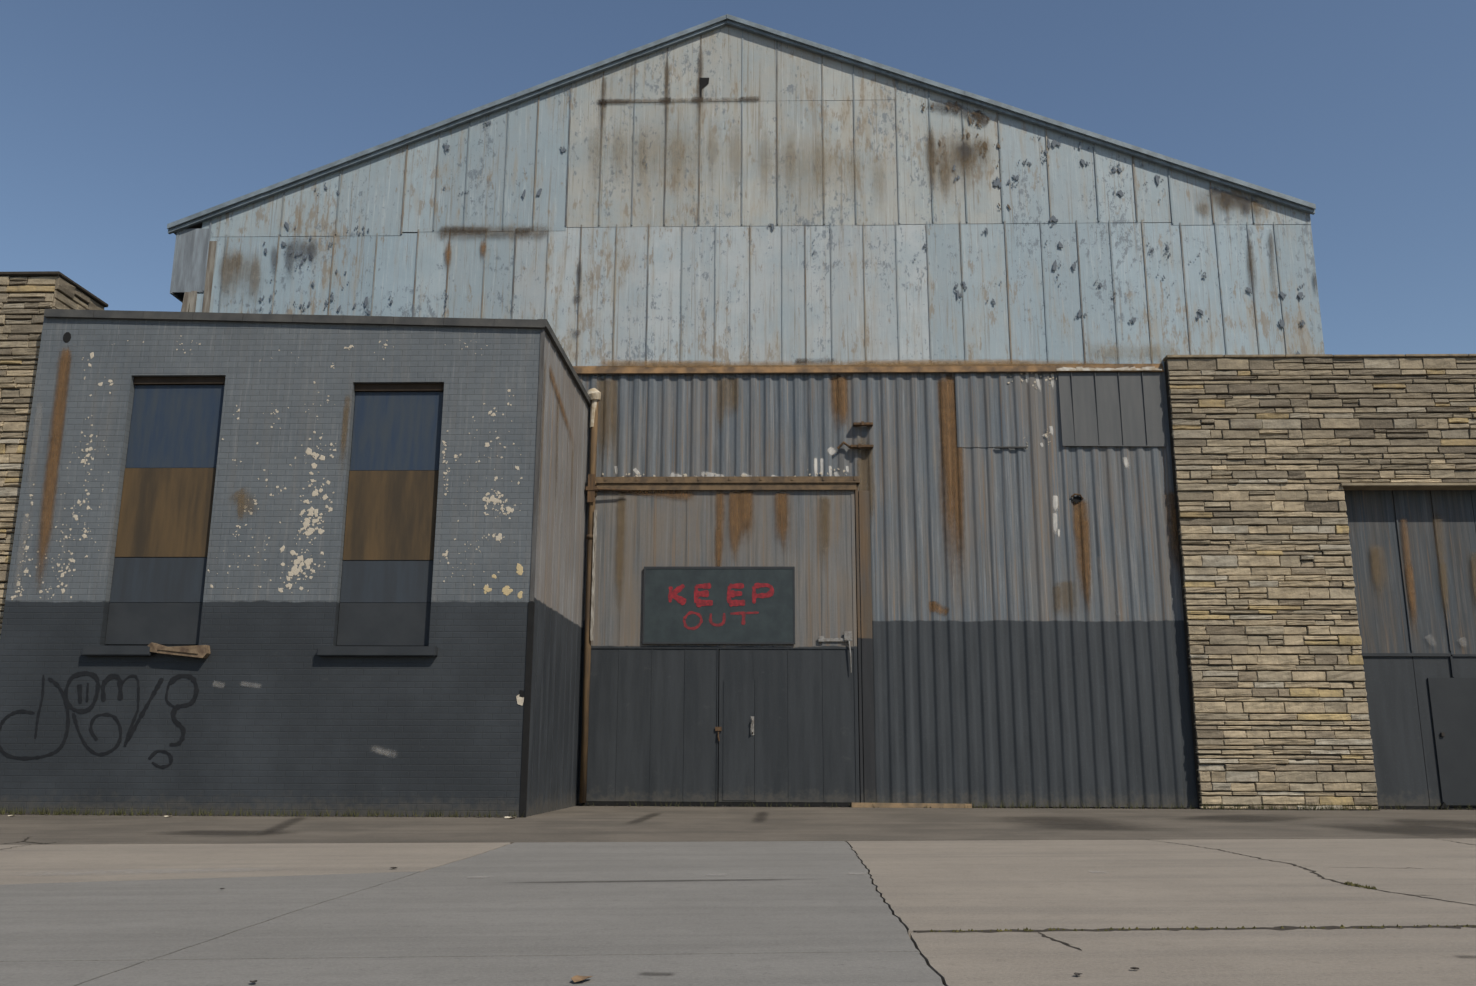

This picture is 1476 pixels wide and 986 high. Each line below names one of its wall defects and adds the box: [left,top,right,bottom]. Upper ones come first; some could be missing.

corrosion [40,350,70,560]
peeling [11,415,109,600]
peeling [208,381,336,593]
peeling [442,389,523,599]
corrosion [716,490,752,567]
corrosion [604,360,1089,548]
corrosion [1071,493,1090,599]
crack [1146,838,1475,905]